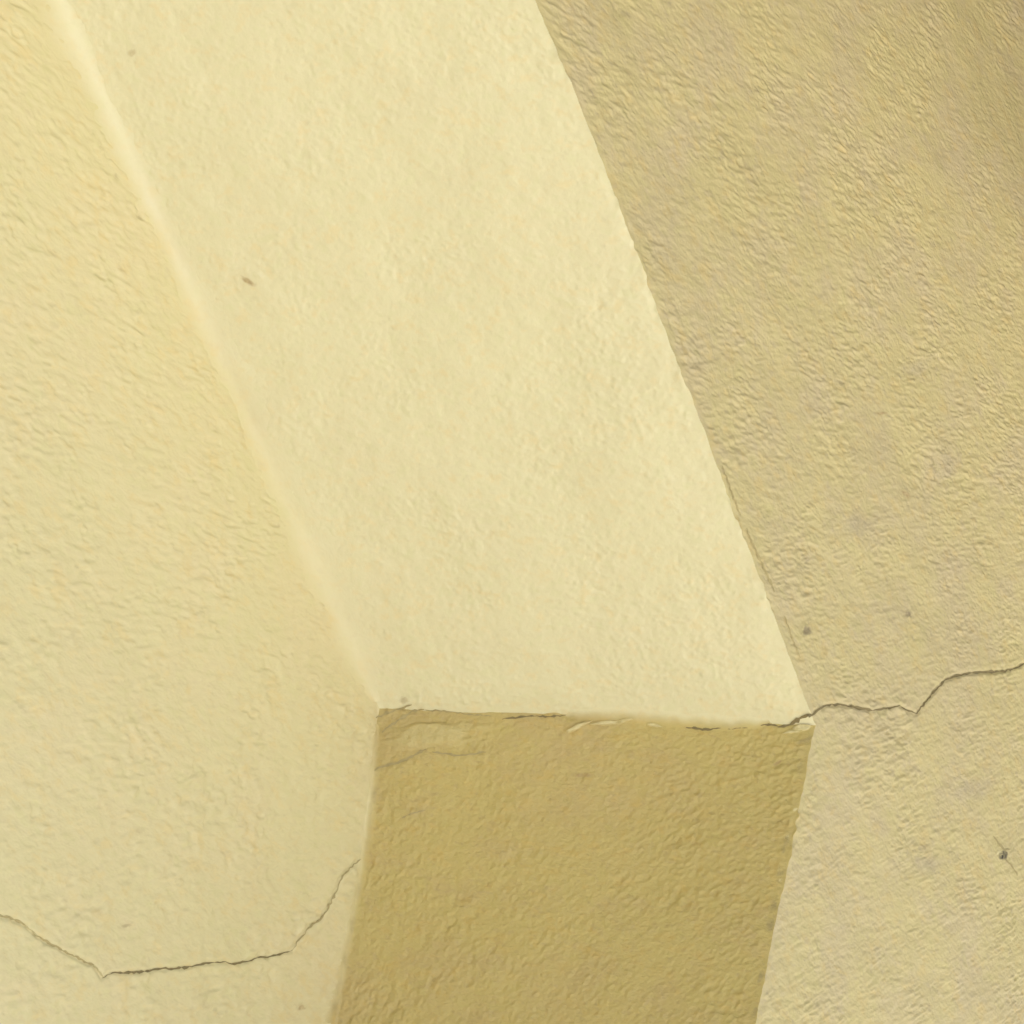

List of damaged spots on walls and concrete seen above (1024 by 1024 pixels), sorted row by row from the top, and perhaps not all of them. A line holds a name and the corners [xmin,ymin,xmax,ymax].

crack [376,705,564,733]
crack [686,663,1024,731]
crack [0,859,361,978]